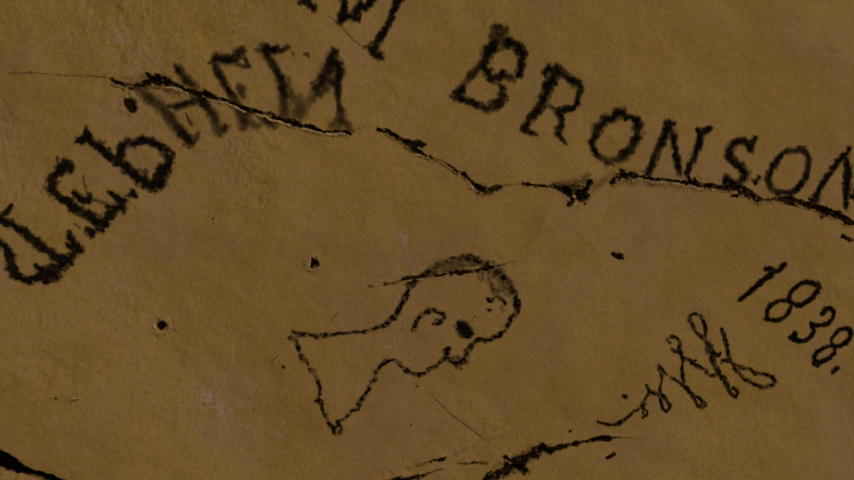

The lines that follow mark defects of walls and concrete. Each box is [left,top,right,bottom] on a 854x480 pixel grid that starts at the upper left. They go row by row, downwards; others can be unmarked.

crack [96,72,503,195]
crack [609,168,854,242]
crack [386,435,612,480]